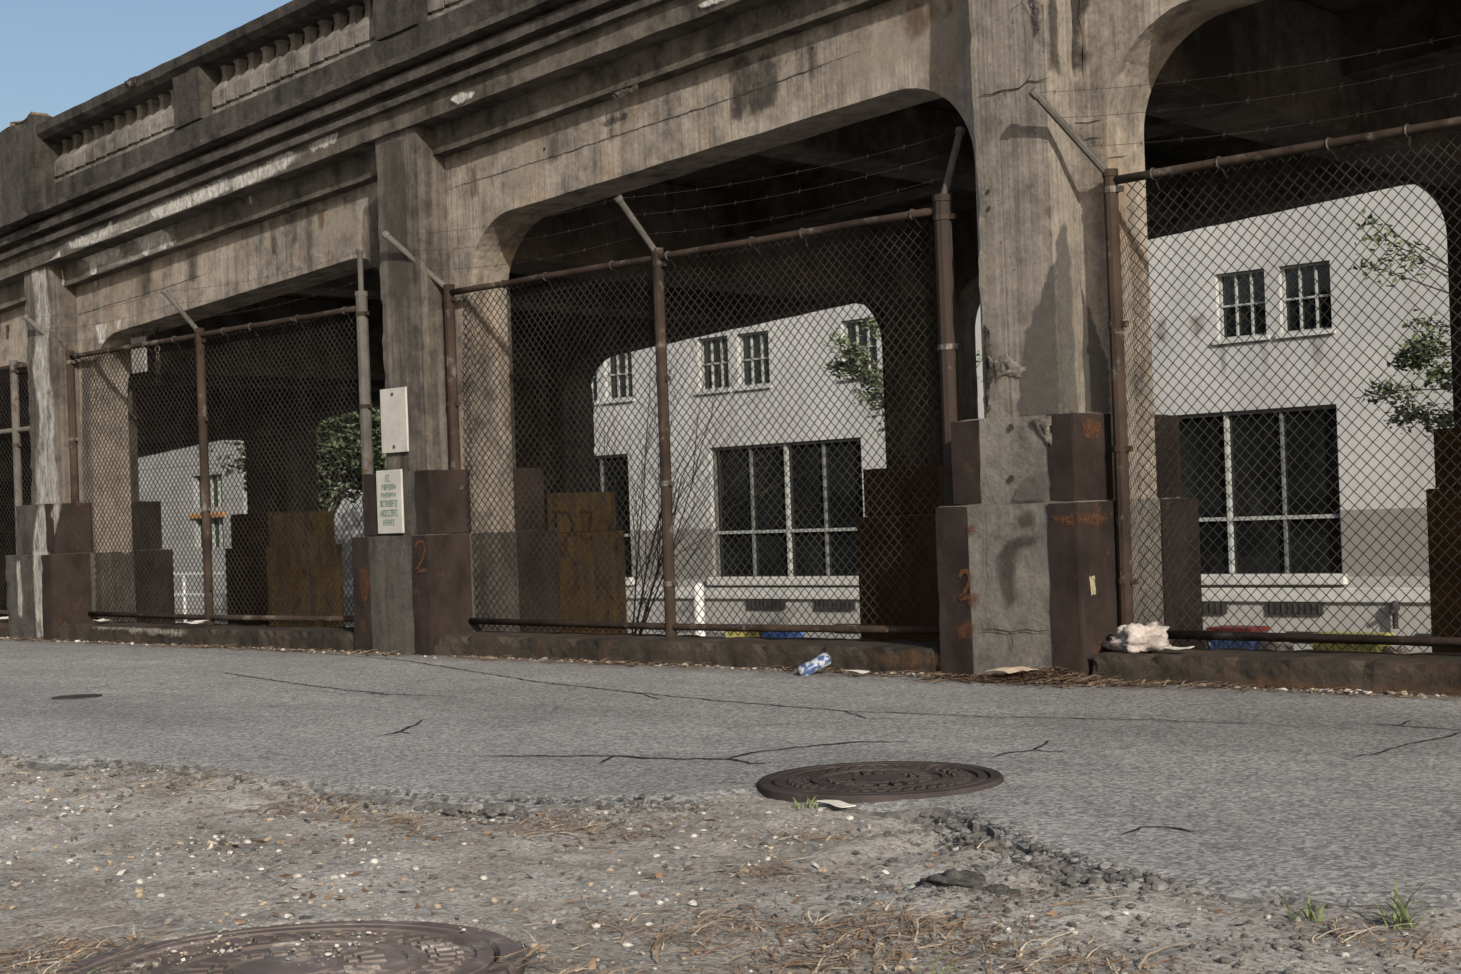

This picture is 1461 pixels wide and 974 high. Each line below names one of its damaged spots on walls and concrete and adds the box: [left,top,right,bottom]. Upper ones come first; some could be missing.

damp [730,54,776,118]
crack [978,0,1084,98]
damp [1018,225,1110,416]
damp [17,132,338,638]
damp [999,471,1050,604]
crack [226,548,989,764]
crack [983,629,1048,651]
crack [994,717,1098,757]
crack [1134,719,1460,758]